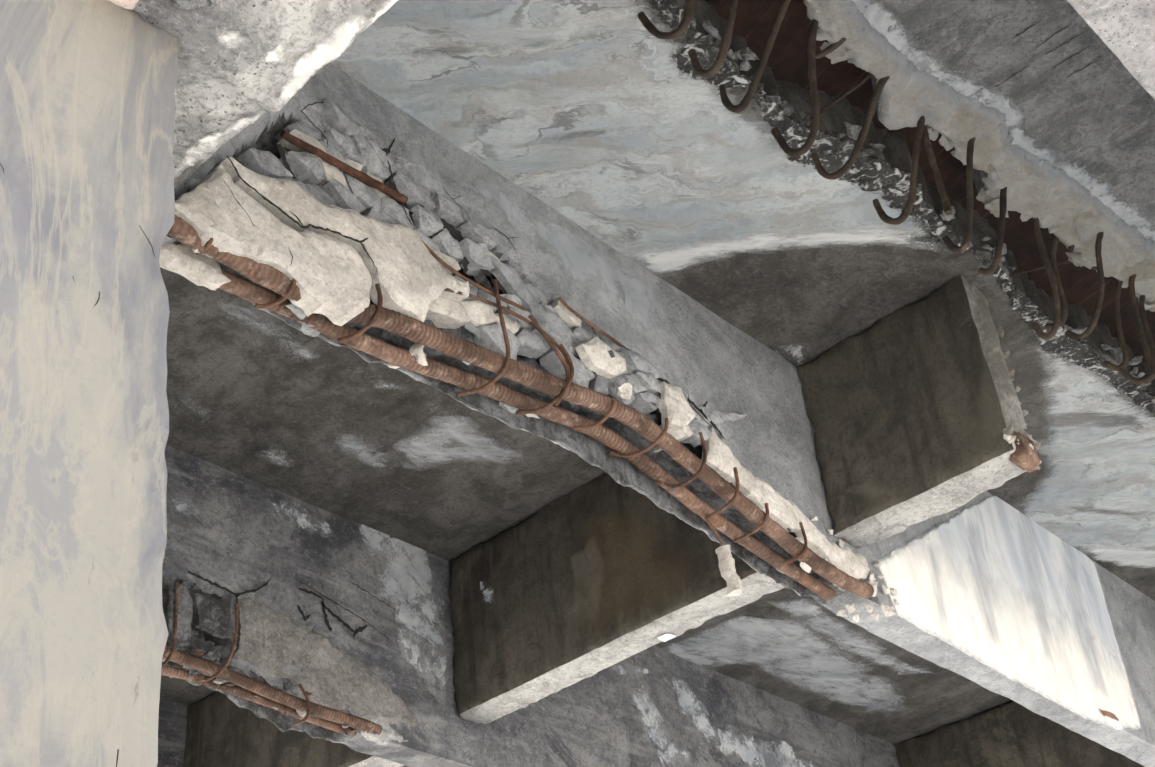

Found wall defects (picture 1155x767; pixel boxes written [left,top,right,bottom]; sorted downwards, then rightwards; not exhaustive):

crack [276,144,298,179]
crack [224,156,379,282]
crack [301,102,341,171]
spalling [637,0,890,180]
spalling [872,115,1016,275]
spalling [159,91,900,623]
leakage [274,0,1155,729]
spalling [1003,370,1042,470]
spalling [1031,218,1155,394]
spalling [161,580,421,746]
crack [188,571,399,661]